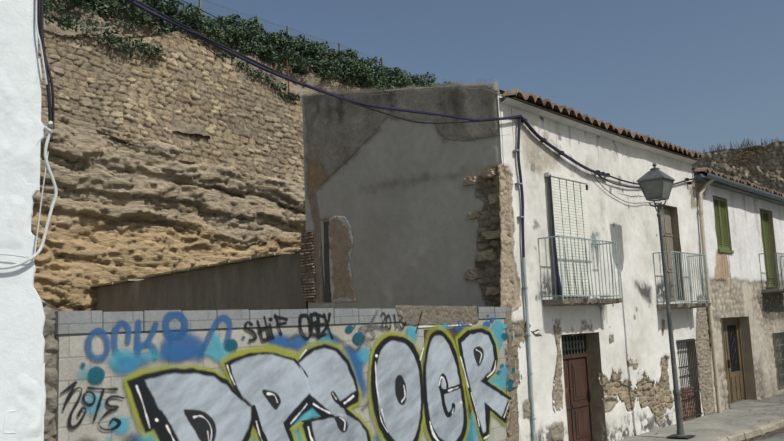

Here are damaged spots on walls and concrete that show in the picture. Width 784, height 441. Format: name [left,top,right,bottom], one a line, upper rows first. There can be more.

flaking render [300,230,316,303]
flaking render [328,215,356,303]
spalling [461,164,531,437]
leakage [636,281,672,303]
flaking render [553,320,563,412]
flaking render [598,354,674,425]
flaking render [550,422,564,441]